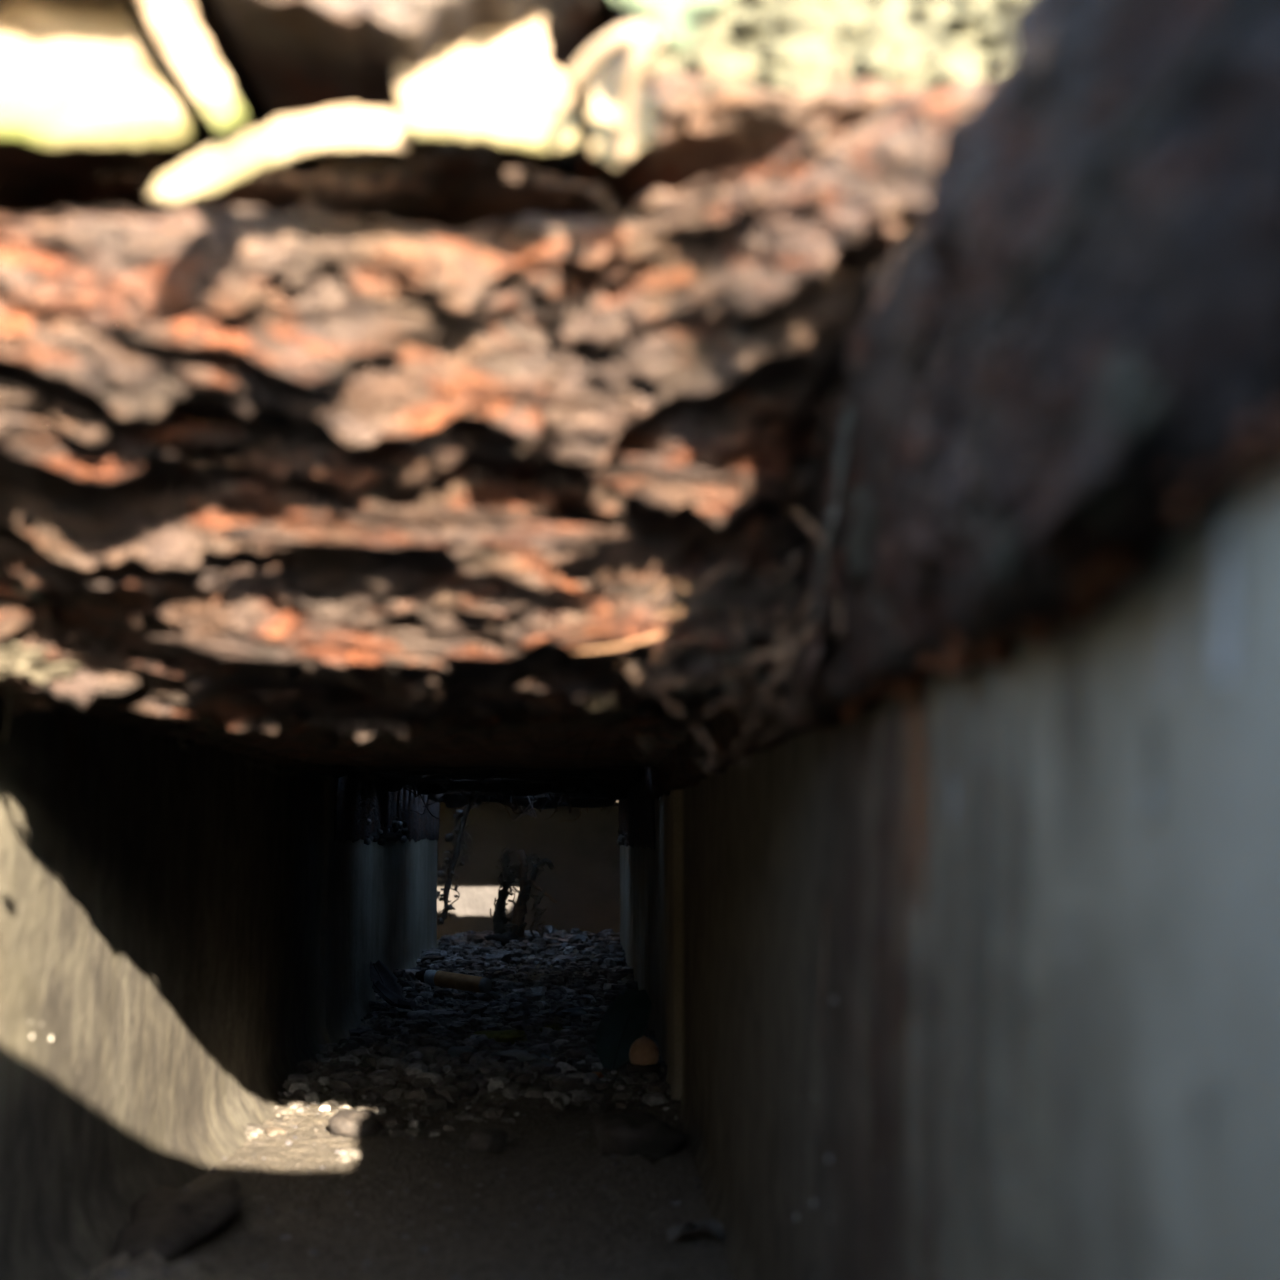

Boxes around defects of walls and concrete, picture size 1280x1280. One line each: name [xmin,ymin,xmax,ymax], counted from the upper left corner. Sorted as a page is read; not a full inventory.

corrosion [836,204,924,300]
corrosion [98,292,484,388]
corrosion [0,361,267,485]
corrosion [457,374,631,443]
corrosion [1013,338,1170,547]
corrosion [0,536,304,598]
corrosion [215,501,627,551]
corrosion [588,455,796,529]
corrosion [0,628,527,742]